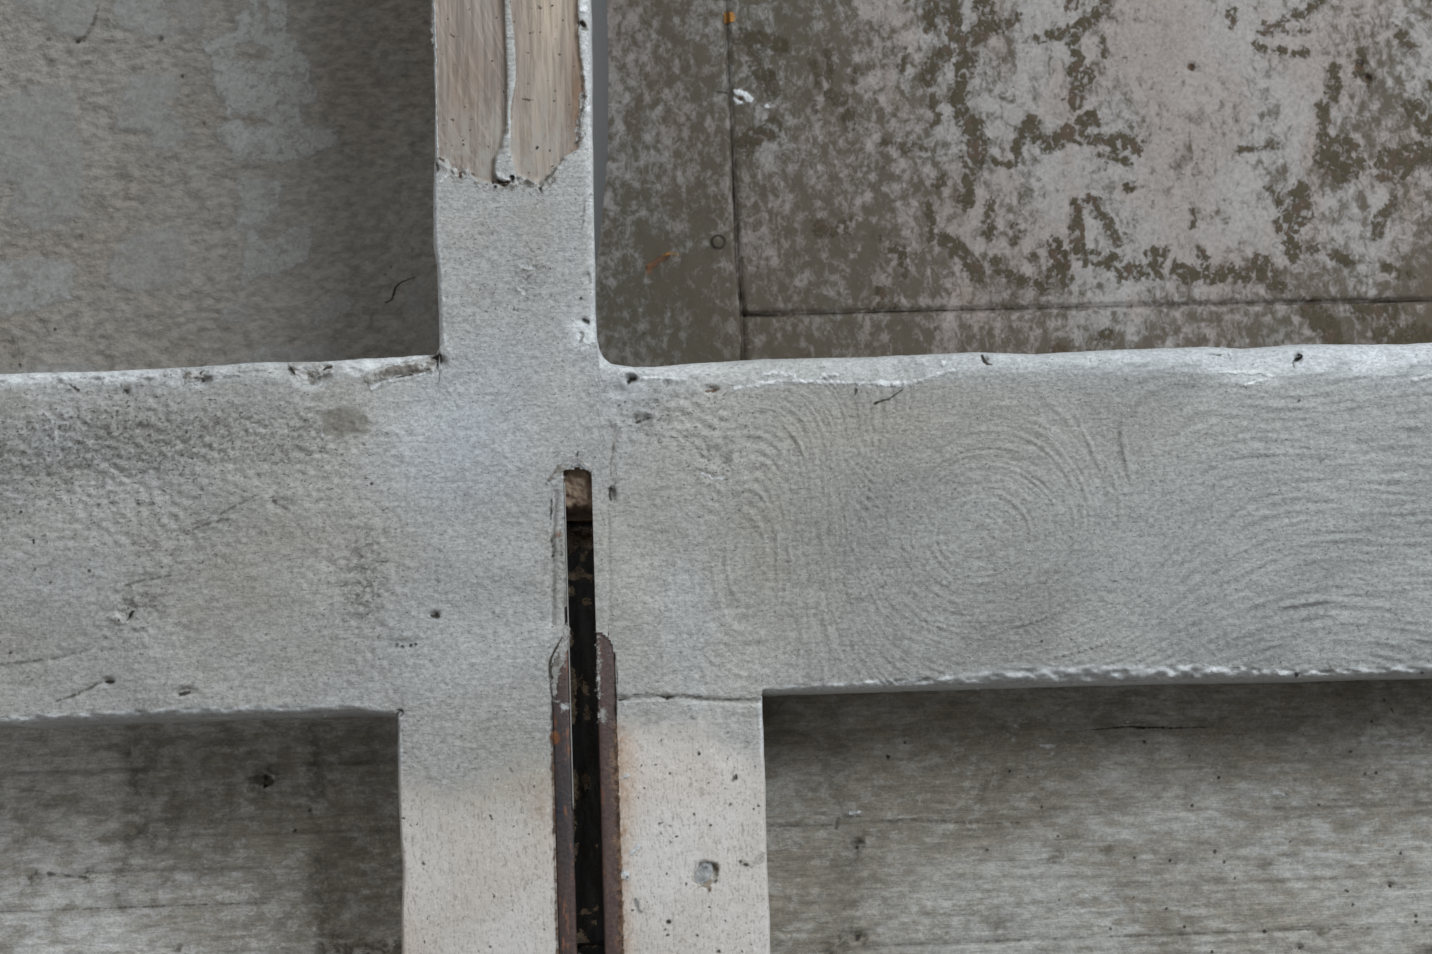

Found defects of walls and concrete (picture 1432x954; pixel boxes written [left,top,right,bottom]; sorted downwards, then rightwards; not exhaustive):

water stain [733,27,790,157]
mould [808,48,861,133]
mould [877,137,929,153]
water stain [897,0,1432,345]
mould [872,235,910,280]
water stain [1087,328,1113,351]
corrosion [551,734,559,954]
corrosion [614,726,625,954]
mould [335,940,402,954]